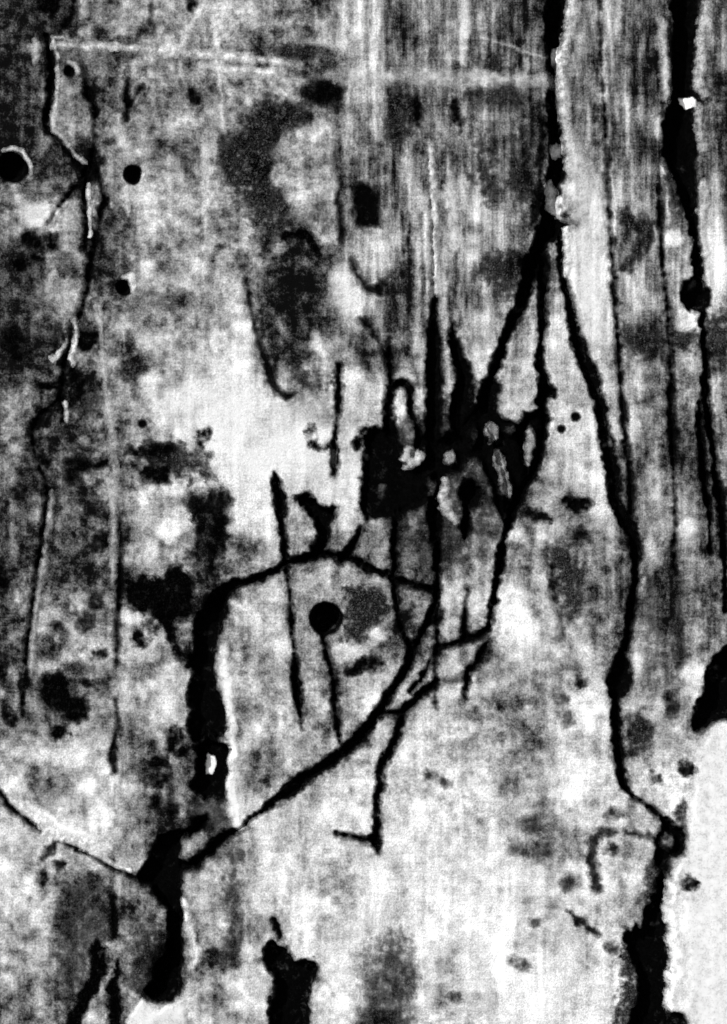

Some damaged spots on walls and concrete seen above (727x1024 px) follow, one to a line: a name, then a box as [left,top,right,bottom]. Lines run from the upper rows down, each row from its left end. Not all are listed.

leakage [218,81,344,257]
crack [21,32,145,718]
leakage [124,428,234,663]
leakage [290,367,332,391]
leakage [398,409,427,468]
crack [184,0,670,872]
leakage [398,454,501,565]
crack [655,0,727,614]
crack [107,697,120,775]